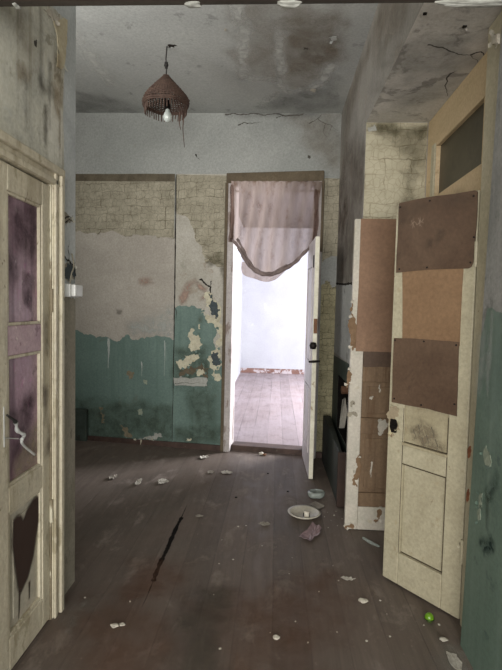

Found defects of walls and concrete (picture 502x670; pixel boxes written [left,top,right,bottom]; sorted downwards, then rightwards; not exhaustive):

crack [428,44,484,61]
crack [225,113,335,137]
peeling [176,292,223,381]
crack [142,506,187,606]